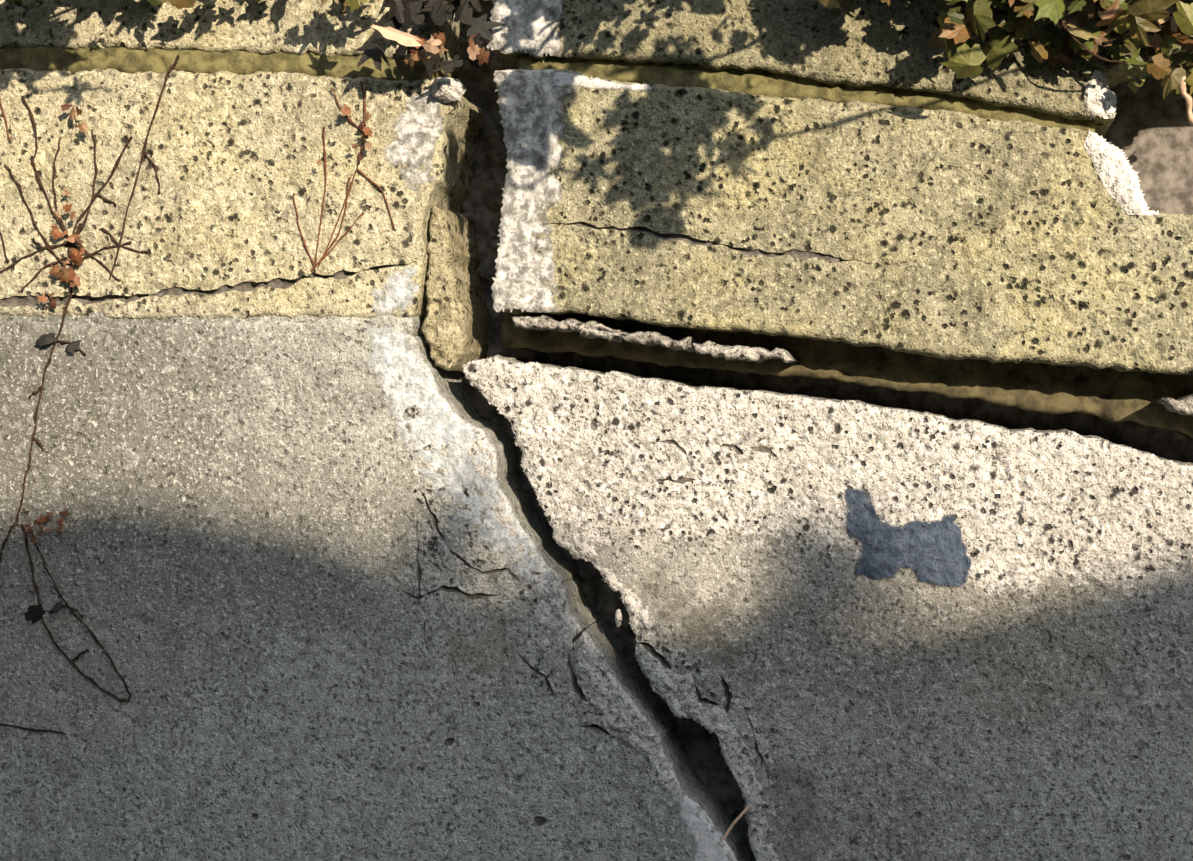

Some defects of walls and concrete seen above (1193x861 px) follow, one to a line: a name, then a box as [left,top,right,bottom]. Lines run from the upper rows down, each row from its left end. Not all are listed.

crack [0,261,417,307]
crack [545,222,872,264]
crack [397,488,524,640]
crack [456,371,777,852]